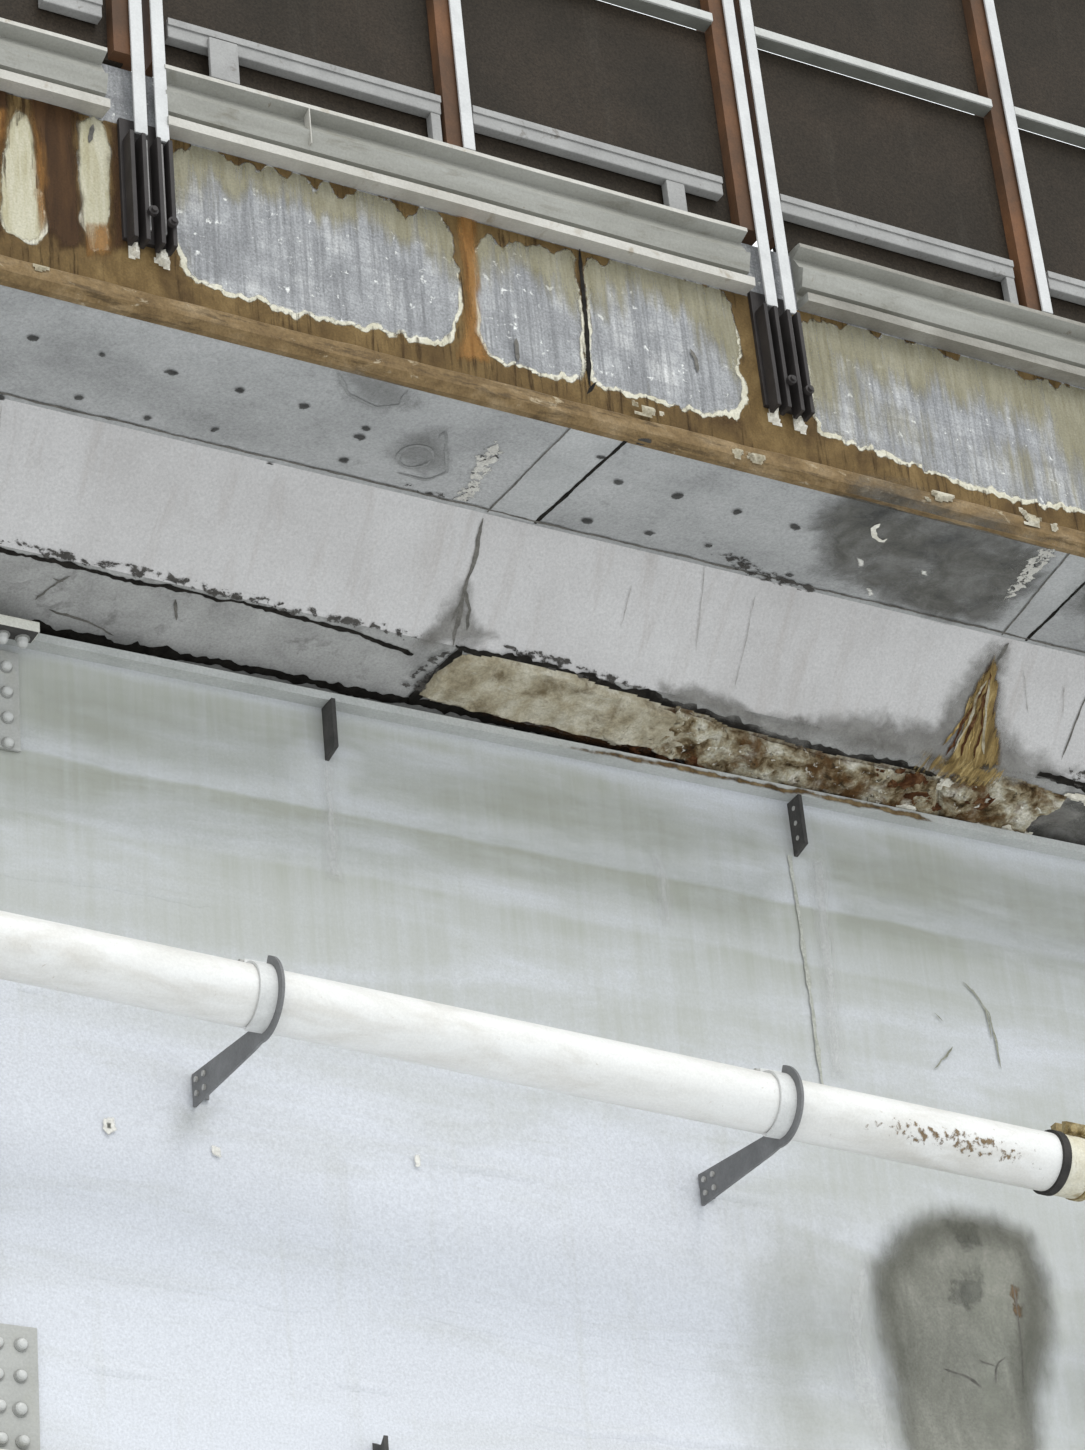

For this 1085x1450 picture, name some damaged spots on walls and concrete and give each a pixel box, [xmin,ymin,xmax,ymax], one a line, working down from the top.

corrosion [0,90,1085,532]
spalling [925,490,955,502]
peeling [0,539,417,638]
spalling [705,544,815,592]
spalling [1004,507,1058,600]
crack [0,519,936,777]
spalling [403,645,1085,835]
crack [1035,685,1085,793]
crack [935,1013,953,1068]
crack [965,983,1001,1067]
corrosion [867,1118,1015,1160]
leakage [877,1215,1049,1450]